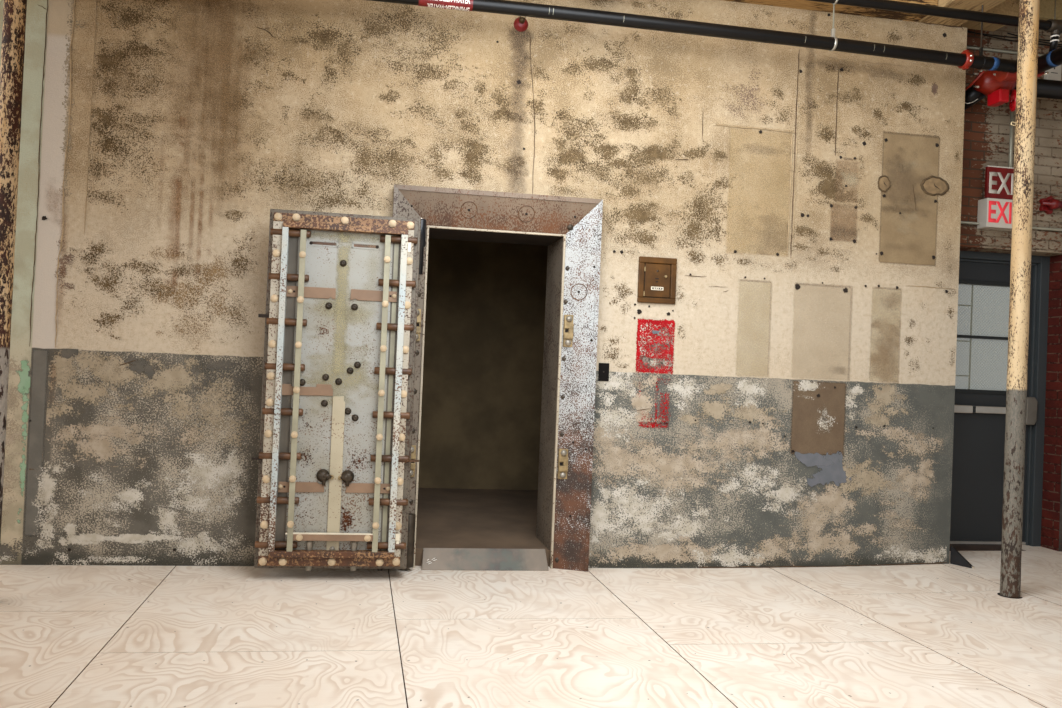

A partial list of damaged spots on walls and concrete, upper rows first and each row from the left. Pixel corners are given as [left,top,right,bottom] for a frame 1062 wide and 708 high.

peeling [0,0,957,568]